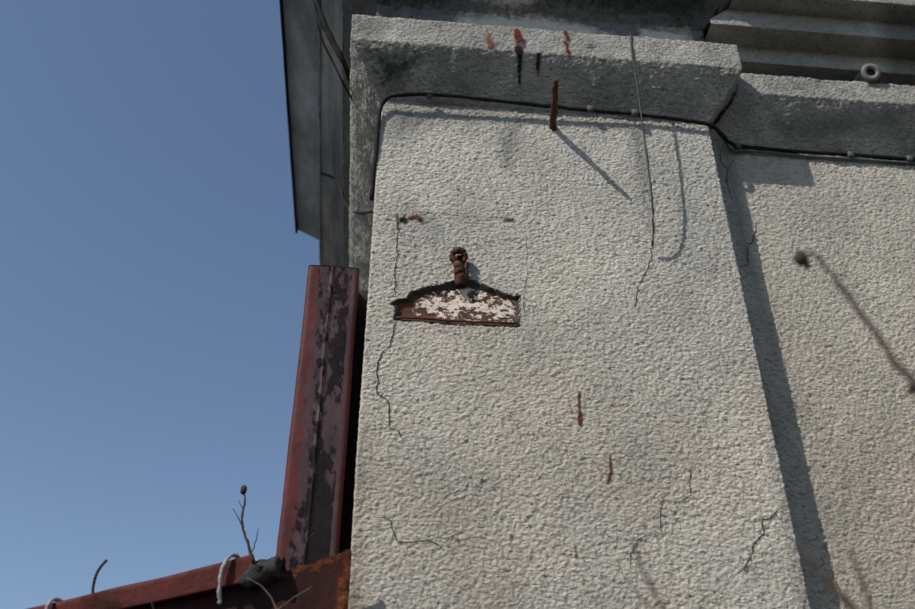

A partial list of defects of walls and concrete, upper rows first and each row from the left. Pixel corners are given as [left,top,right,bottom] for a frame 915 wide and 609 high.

crack [709,85,739,128]
crack [394,210,511,297]
peeling [390,280,521,327]
crack [635,246,652,308]
crack [376,320,403,439]
crack [606,464,693,571]
crack [736,507,783,575]
rust [293,552,351,609]